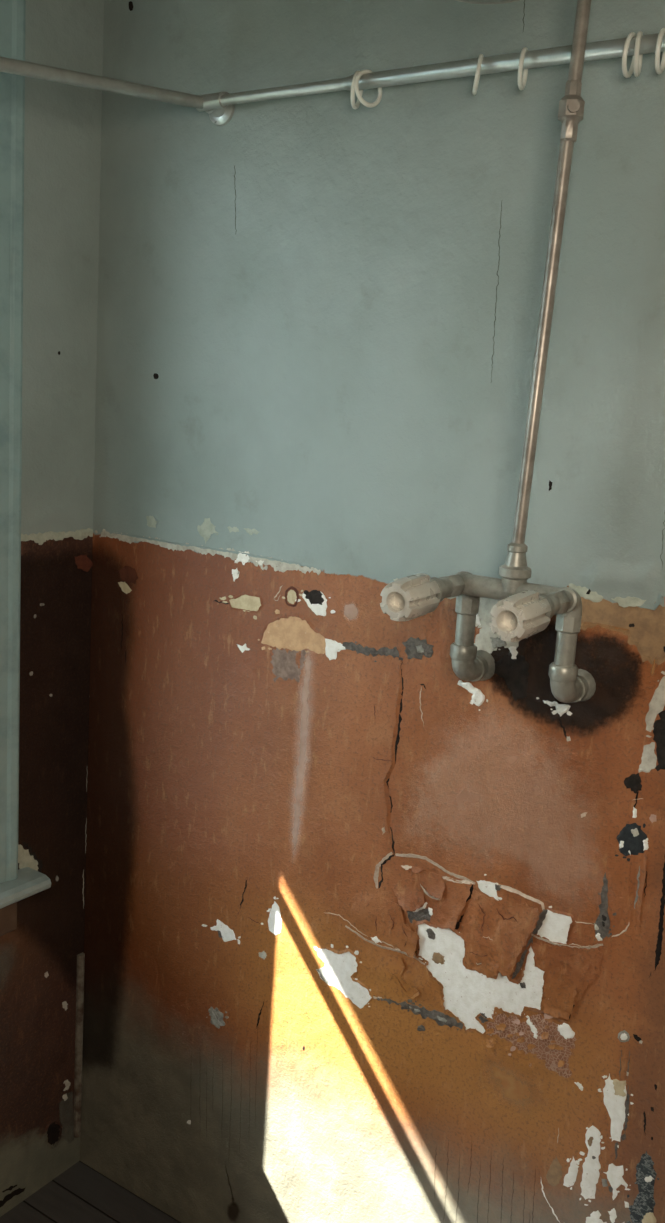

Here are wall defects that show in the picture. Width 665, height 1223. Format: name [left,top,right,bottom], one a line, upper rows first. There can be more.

flaking render [21,515,345,682]
crack [373,660,475,889]
flaking render [458,680,488,711]
flaking render [474,597,572,717]
damp [490,621,641,734]
peeling [567,583,665,862]
peeling [202,919,241,944]
flaking render [314,944,374,1010]
flaking render [375,865,616,1091]
peeling [563,1040,659,1223]